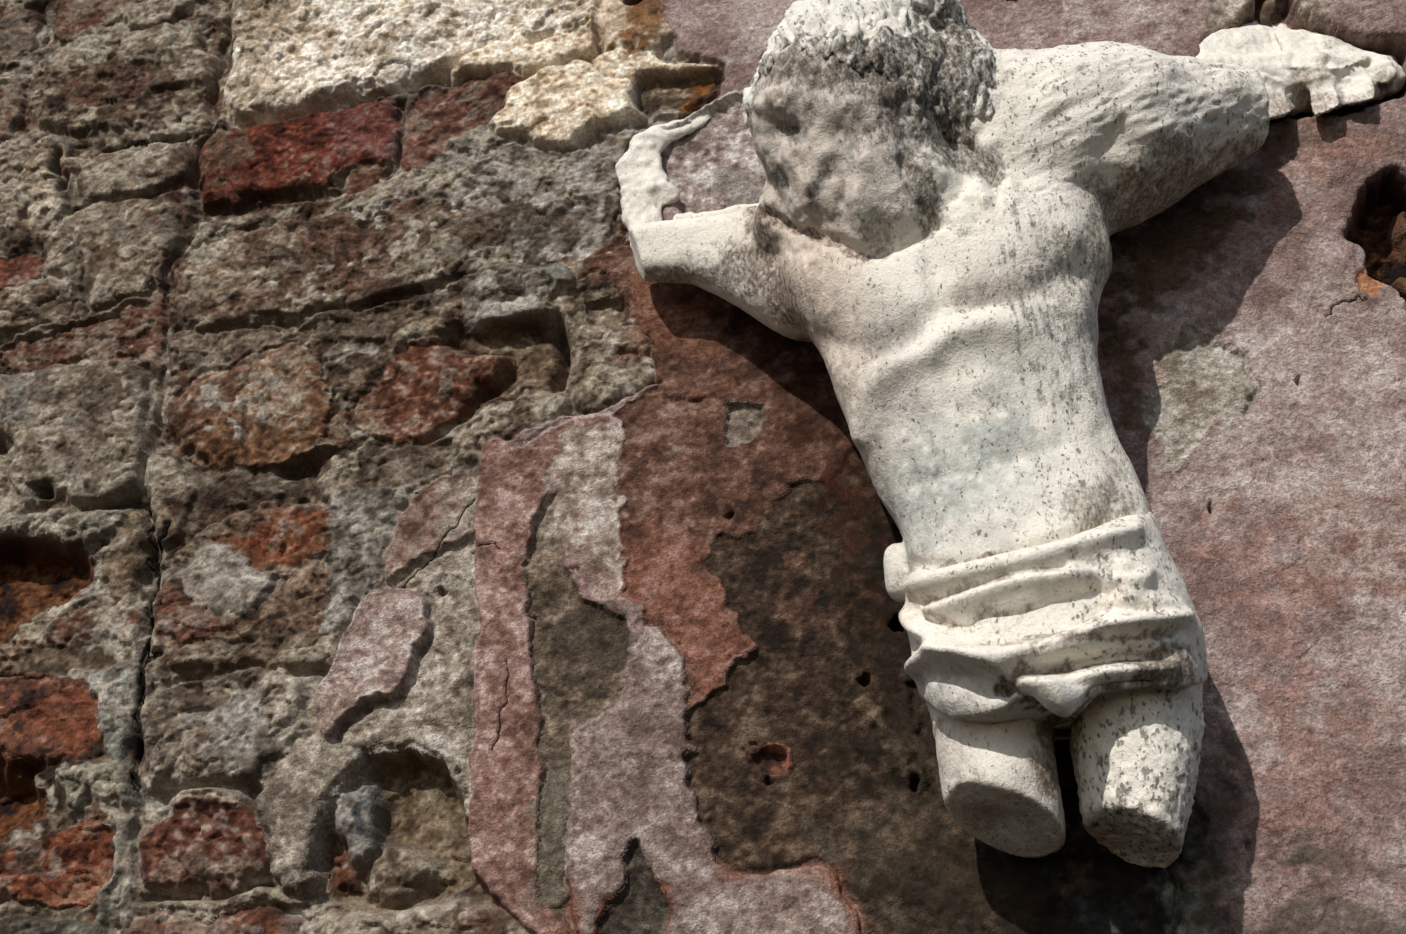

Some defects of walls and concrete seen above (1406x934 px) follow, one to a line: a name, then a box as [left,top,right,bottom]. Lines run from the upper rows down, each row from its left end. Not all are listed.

crack [129,509,171,792]
crack [402,499,500,588]
flaking render [126,239,1210,934]